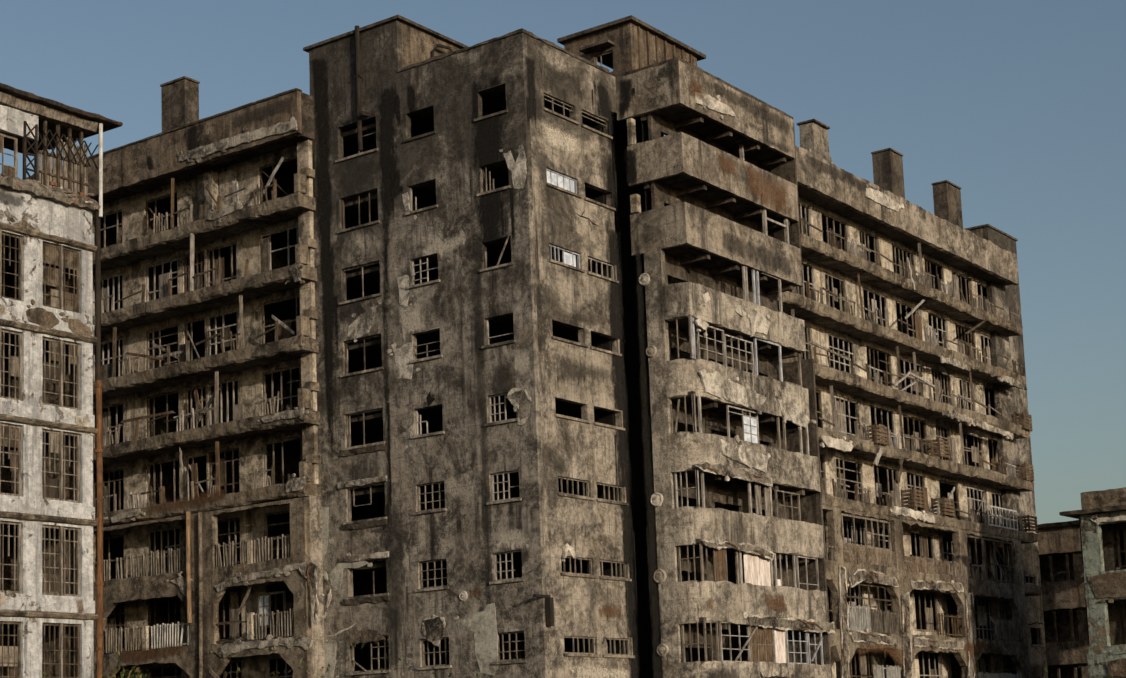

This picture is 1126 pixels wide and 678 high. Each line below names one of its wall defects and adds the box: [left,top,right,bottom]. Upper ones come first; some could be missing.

peeling [693,93,736,120]
spalling [177,117,298,162]
water stain [470,77,515,247]
peeling [499,145,527,189]
rust [719,155,790,213]
peeling [0,299,96,343]
water stain [313,59,416,663]
water stain [471,271,515,601]
spalling [506,388,532,425]
peeling [699,369,854,452]
spalling [215,561,332,625]
spalling [742,565,975,678]